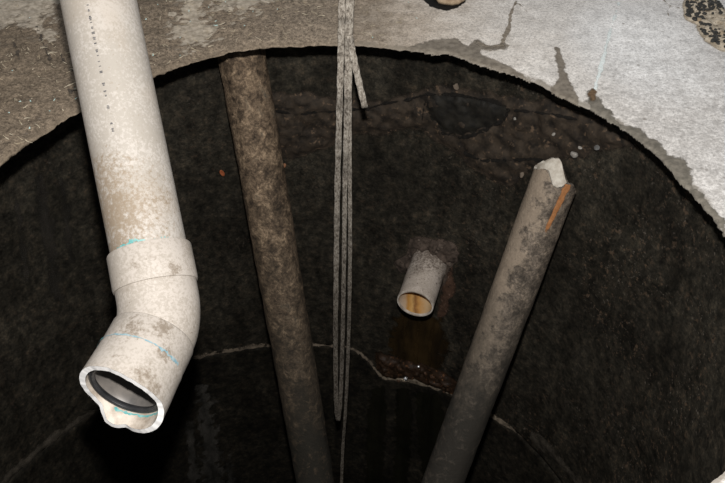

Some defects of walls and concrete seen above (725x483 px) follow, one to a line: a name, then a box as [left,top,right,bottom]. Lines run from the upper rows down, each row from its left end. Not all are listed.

crack [276,92,577,163]
leakage [551,2,725,237]